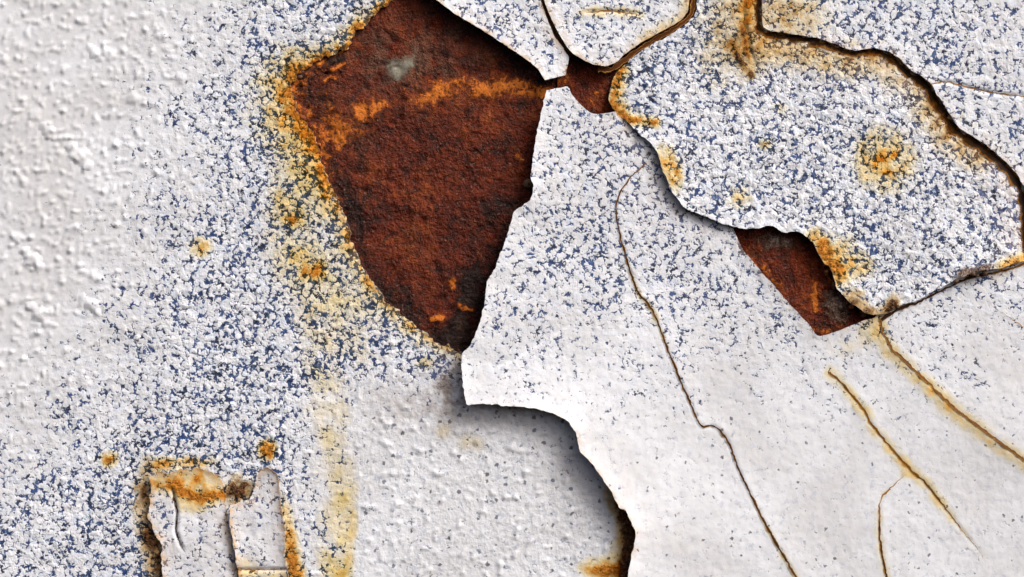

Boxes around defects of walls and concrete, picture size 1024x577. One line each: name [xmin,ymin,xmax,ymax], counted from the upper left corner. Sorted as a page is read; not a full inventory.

crack [541,0,572,57]
crack [590,8,633,16]
crack [598,0,696,73]
rust [735,27,754,78]
rust [279,53,329,186]
peeling [288,0,1024,577]
rust [818,239,843,275]
crack [754,0,1024,461]
crack [615,163,797,577]
peeling [147,467,289,577]
rust [226,479,250,498]
crack [829,372,978,577]